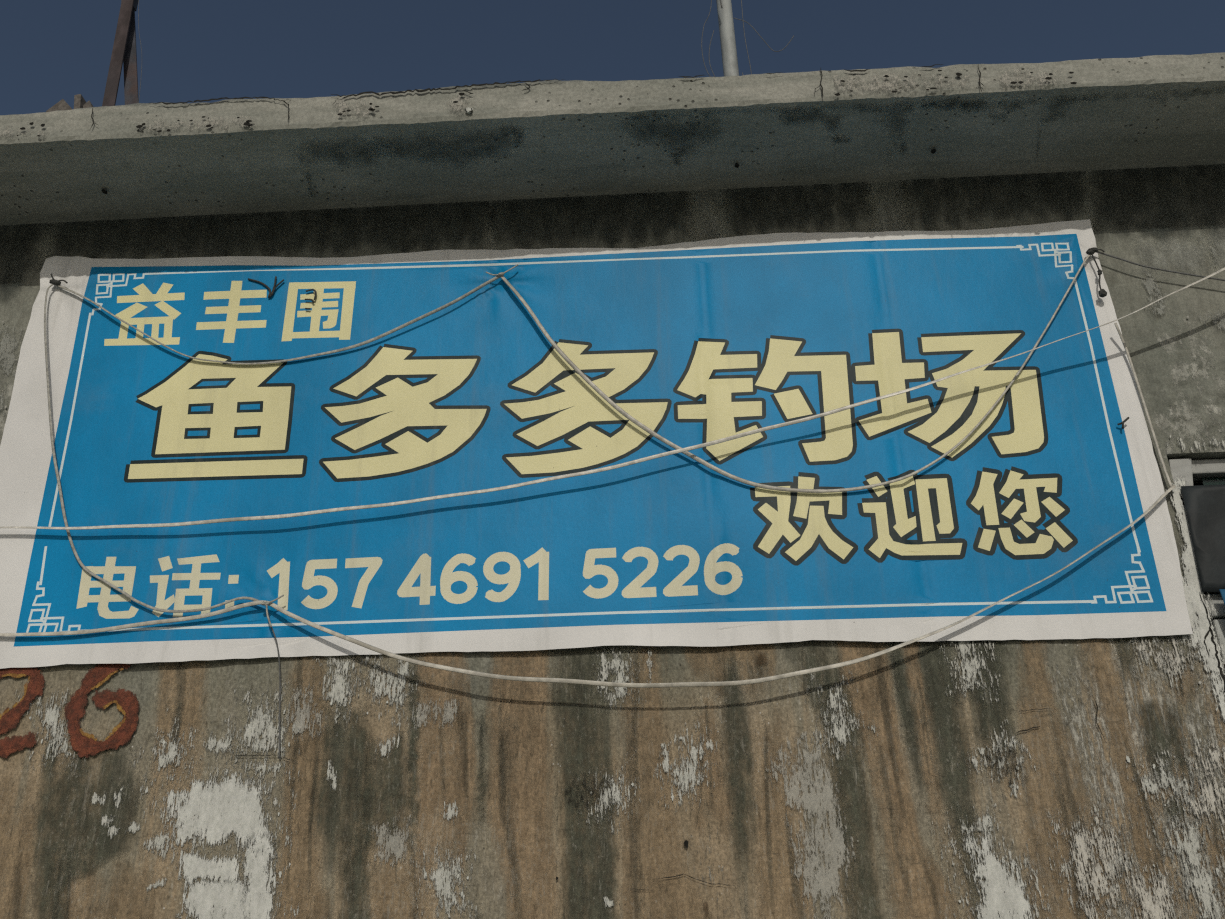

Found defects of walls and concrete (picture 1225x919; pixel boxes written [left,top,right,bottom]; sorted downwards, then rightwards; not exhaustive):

damp [56,191,685,258]
damp [0,743,150,919]
damp [158,660,204,770]
peeling [91,652,458,919]
peeling [368,814,480,919]
damp [281,648,702,919]
damp [685,643,810,919]
peeling [762,671,879,919]
damp [806,640,1116,919]
peeling [932,475,1225,919]
damp [1091,638,1173,919]
damp [1145,707,1184,783]